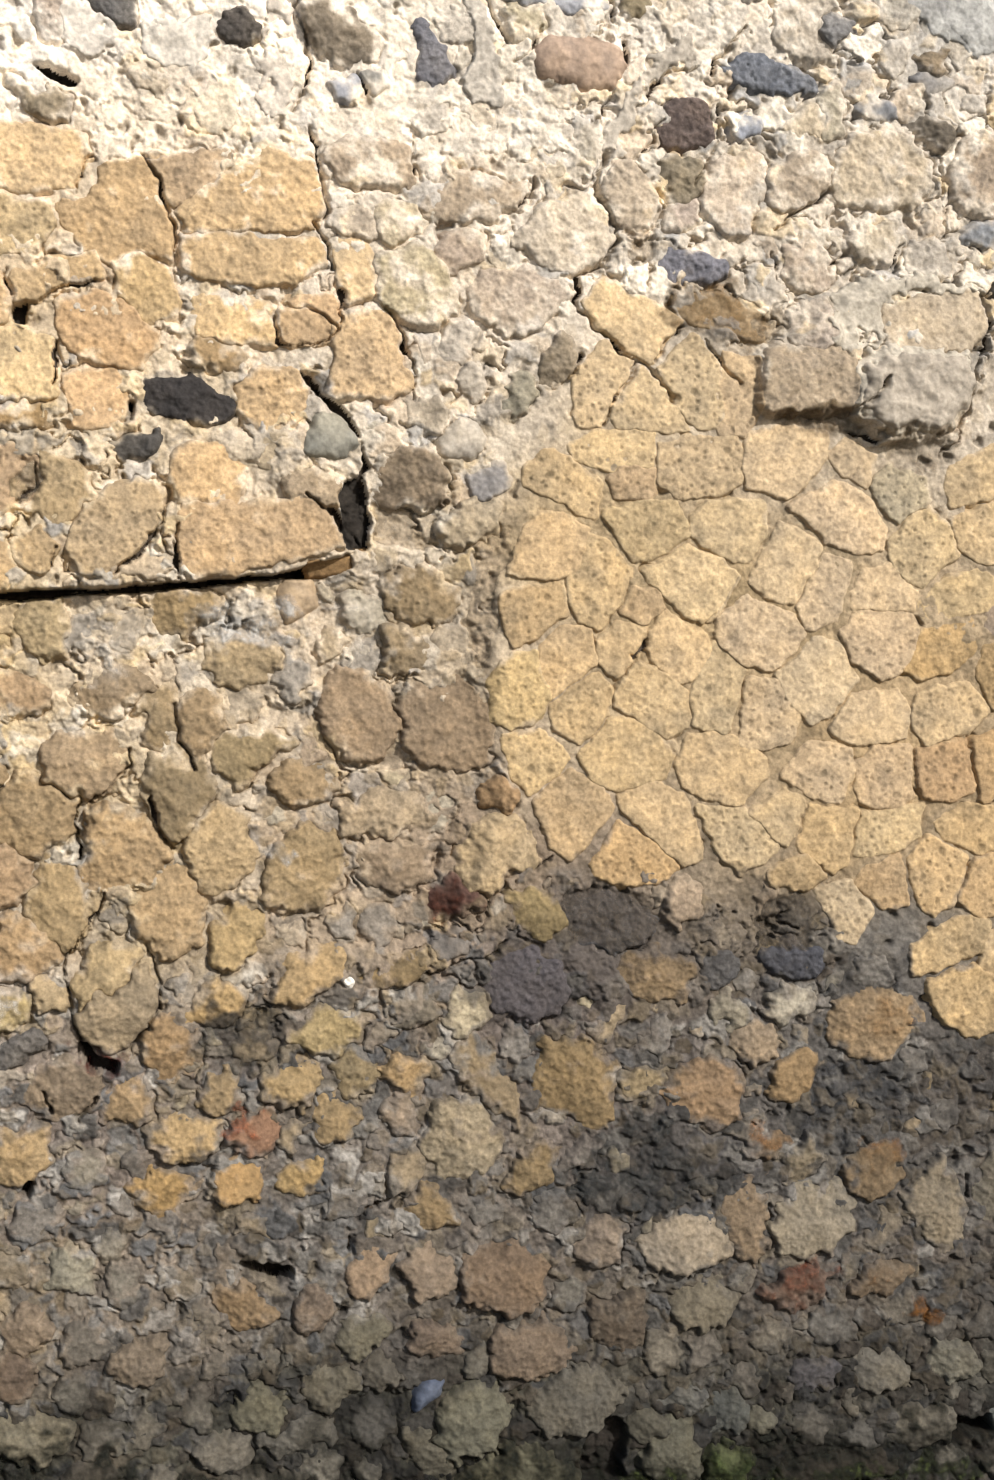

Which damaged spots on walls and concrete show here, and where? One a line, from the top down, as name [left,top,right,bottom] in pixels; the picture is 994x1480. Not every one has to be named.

crack [309,135,319,174]
crack [158,181,166,205]
crack [327,246,345,306]
crack [51,342,59,381]
crack [275,331,369,533]
crack [21,489,35,499]
crack [121,530,180,572]